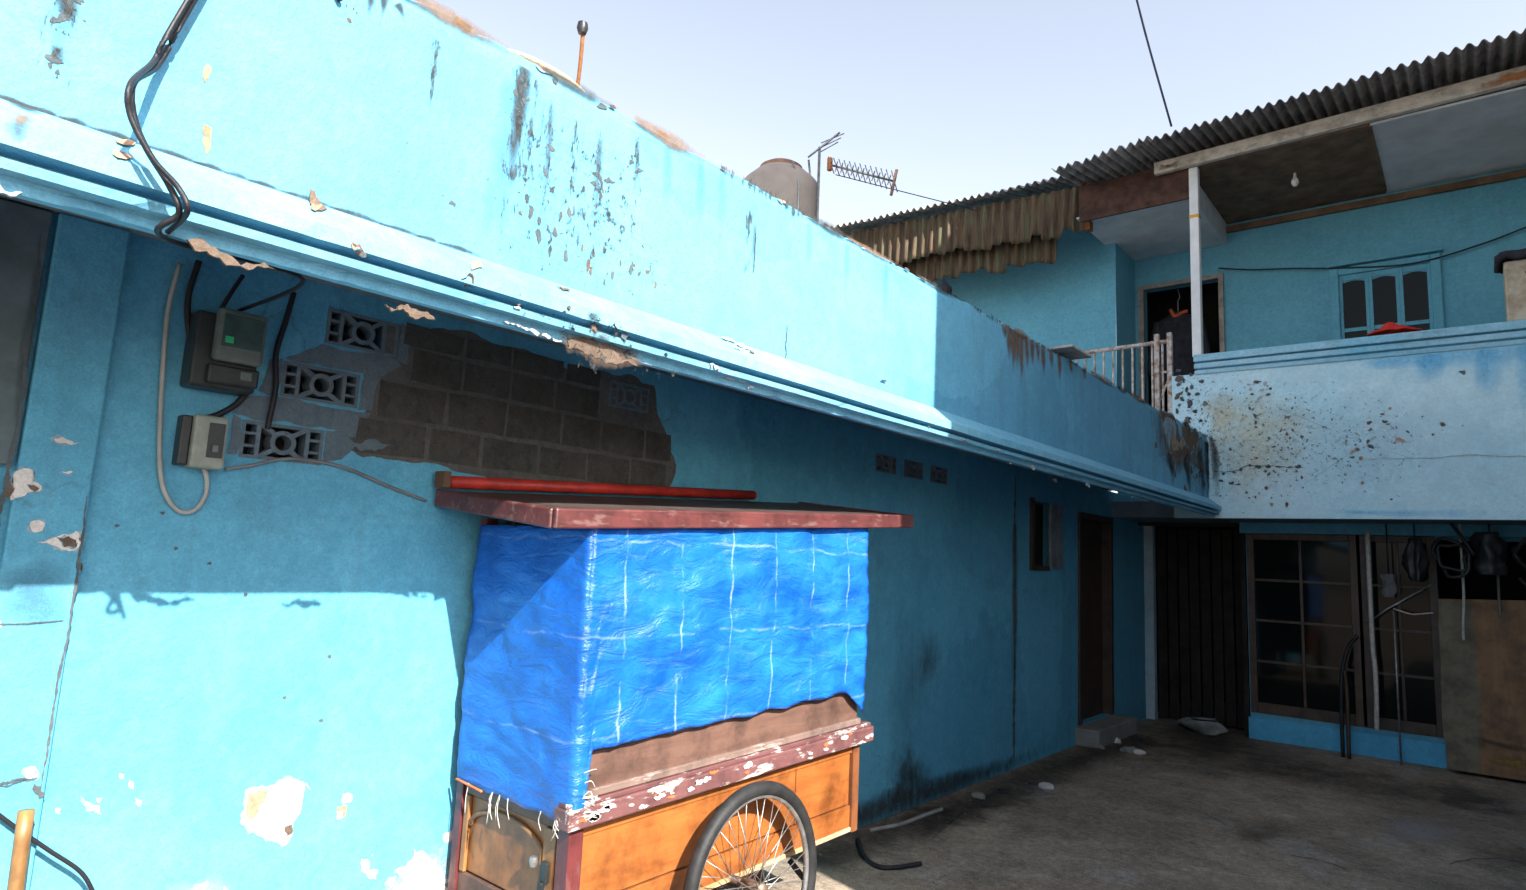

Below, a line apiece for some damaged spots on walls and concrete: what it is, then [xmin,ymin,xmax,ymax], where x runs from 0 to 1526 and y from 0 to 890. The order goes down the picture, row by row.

spalling [0,185,23,197]
spalling [186,238,275,271]
spalling [384,304,435,320]
peeling [503,306,562,342]
corrosion [1002,324,1086,377]
crack [0,232,41,526]
peeling [2,466,43,500]
peeling [26,519,85,552]
crack [0,496,87,827]
peeling [240,776,313,847]
damp [801,736,1152,865]
peeling [361,829,453,890]